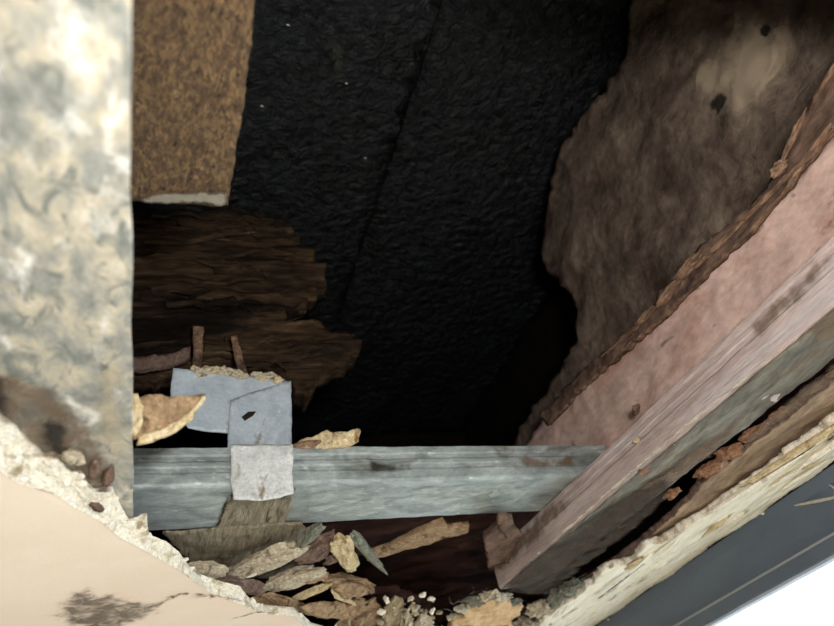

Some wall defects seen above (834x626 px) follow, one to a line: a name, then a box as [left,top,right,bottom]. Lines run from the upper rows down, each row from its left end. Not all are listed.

damp [0,377,109,492]
spalling [136,395,206,446]
spalling [0,413,282,616]
damp [65,593,240,626]
peeling [331,588,356,605]